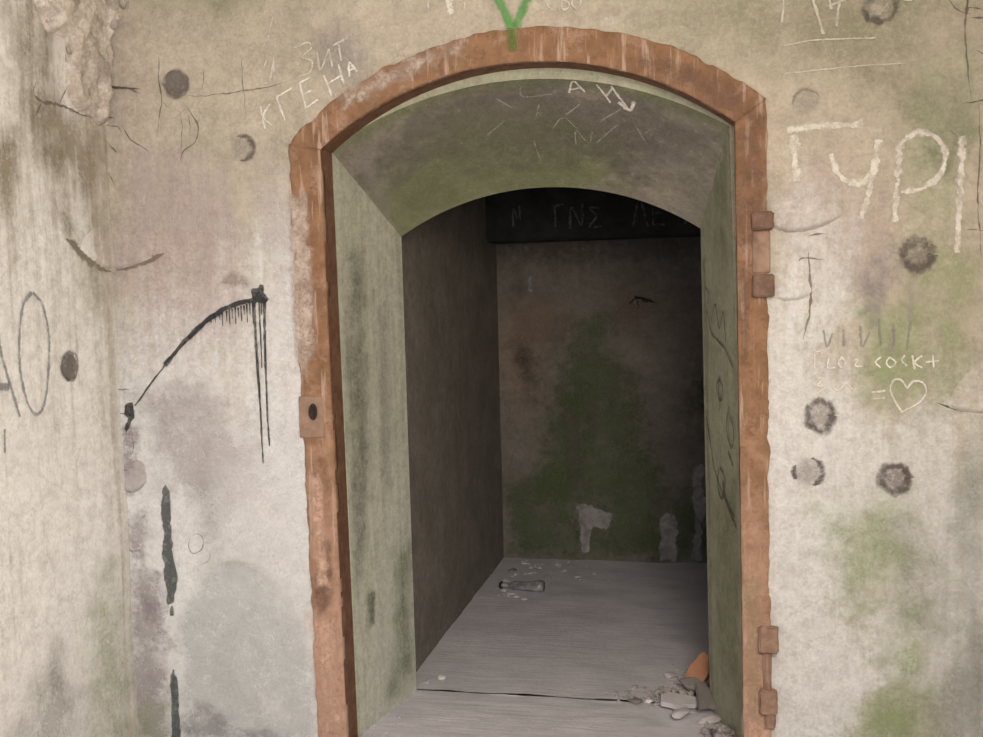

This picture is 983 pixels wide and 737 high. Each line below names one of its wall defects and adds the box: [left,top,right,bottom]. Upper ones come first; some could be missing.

spalling [31,0,127,127]
corrosion [311,476,341,733]